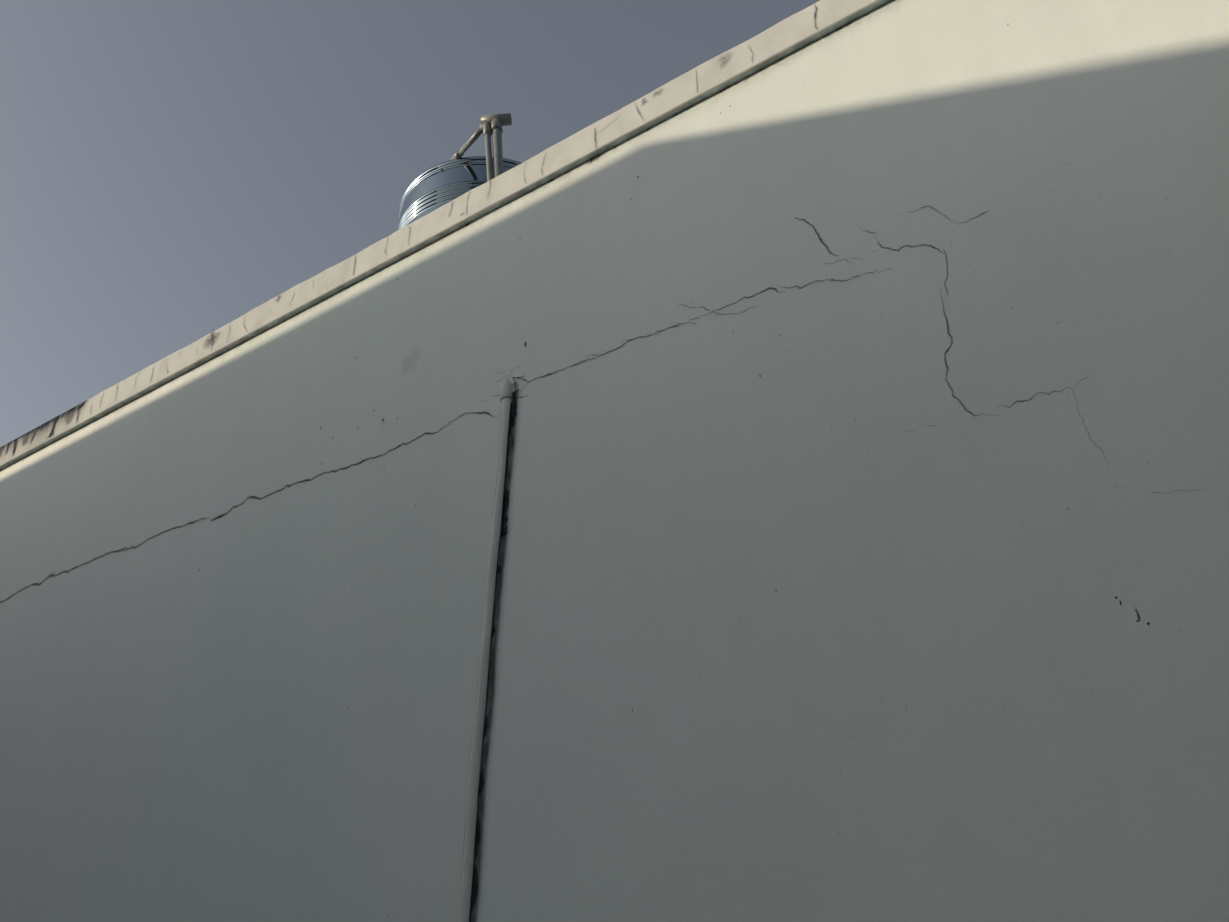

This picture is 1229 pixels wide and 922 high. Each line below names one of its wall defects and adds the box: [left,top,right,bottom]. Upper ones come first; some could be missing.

crack [522,325,678,398]
crack [719,218,858,310]
crack [868,231,978,416]
crack [0,412,491,603]